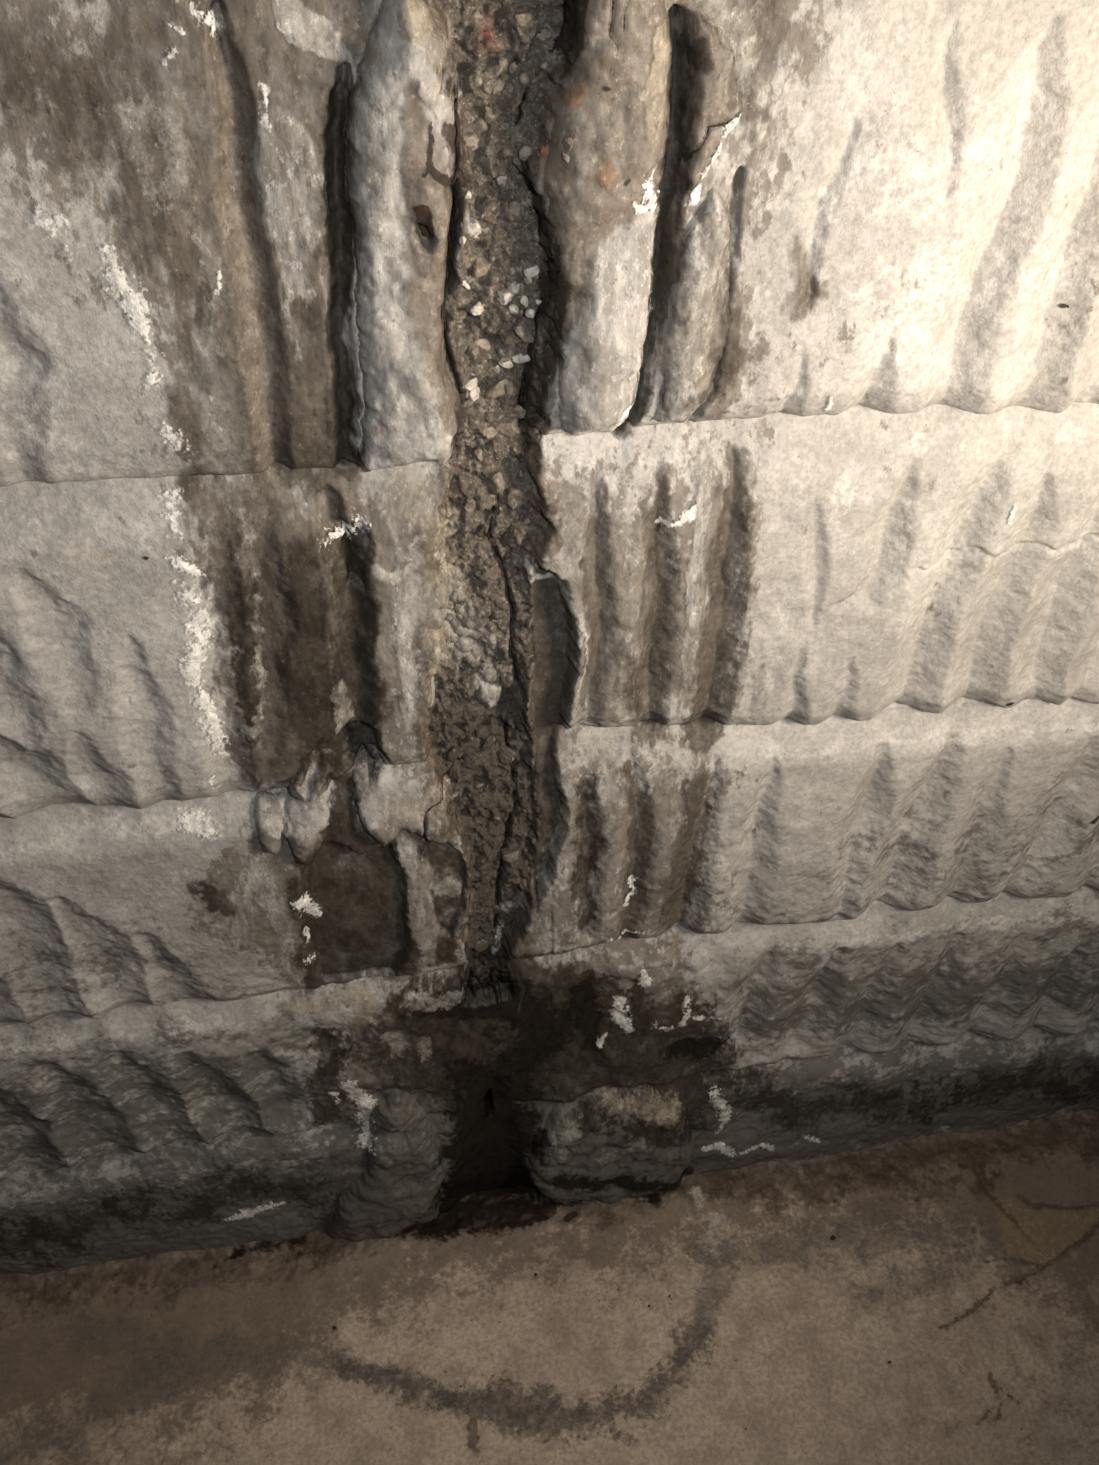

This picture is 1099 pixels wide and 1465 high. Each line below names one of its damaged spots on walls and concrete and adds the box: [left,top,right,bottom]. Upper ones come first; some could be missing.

crack [549,0,630,53]
crack [423,84,469,405]
crack [515,86,561,427]
damp [2,0,904,1242]
crack [486,495,519,681]
crack [422,757,464,838]
crack [465,719,526,1016]
damp [0,1163,382,1314]
damp [781,1109,1099,1205]
damp [907,1060,1099,1125]